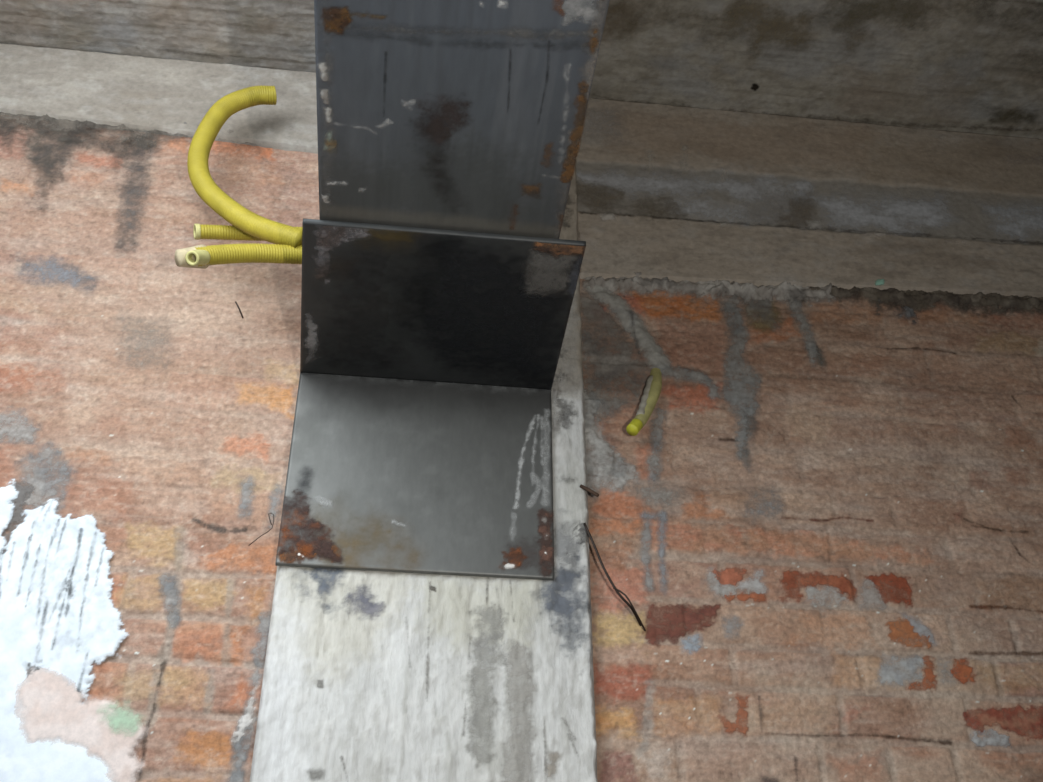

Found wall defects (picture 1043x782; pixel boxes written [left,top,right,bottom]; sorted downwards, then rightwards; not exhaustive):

corrosion [322,7,385,34]
corrosion [561,82,588,183]
damp [116,144,153,248]
corrosion [278,490,342,563]
corrosion [503,548,526,566]
corrosion [537,509,554,576]
flaking render [0,479,145,782]